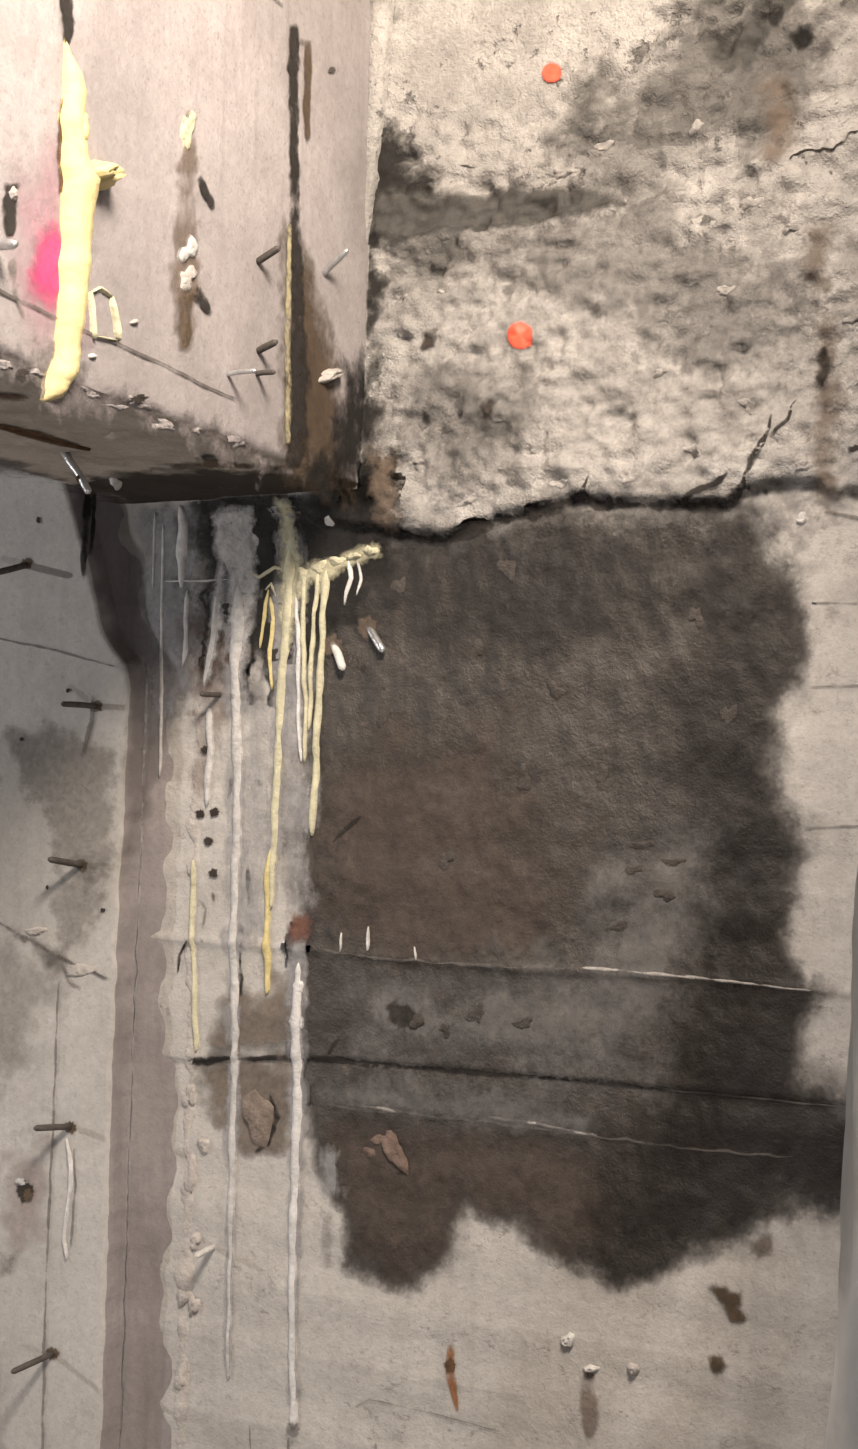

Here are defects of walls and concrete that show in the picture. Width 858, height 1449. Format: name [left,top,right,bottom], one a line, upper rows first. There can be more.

water stain [179,111,215,209]
crack [790,130,858,159]
water stain [88,286,139,358]
water stain [173,221,211,349]
water stain [0,460,60,480]
crack [395,401,795,543]
crack [827,511,858,520]
water stain [6,709,113,956]
water stain [287,125,846,1429]
water stain [80,461,319,1380]
water stain [62,1138,77,1260]
rust [443,1347,458,1410]